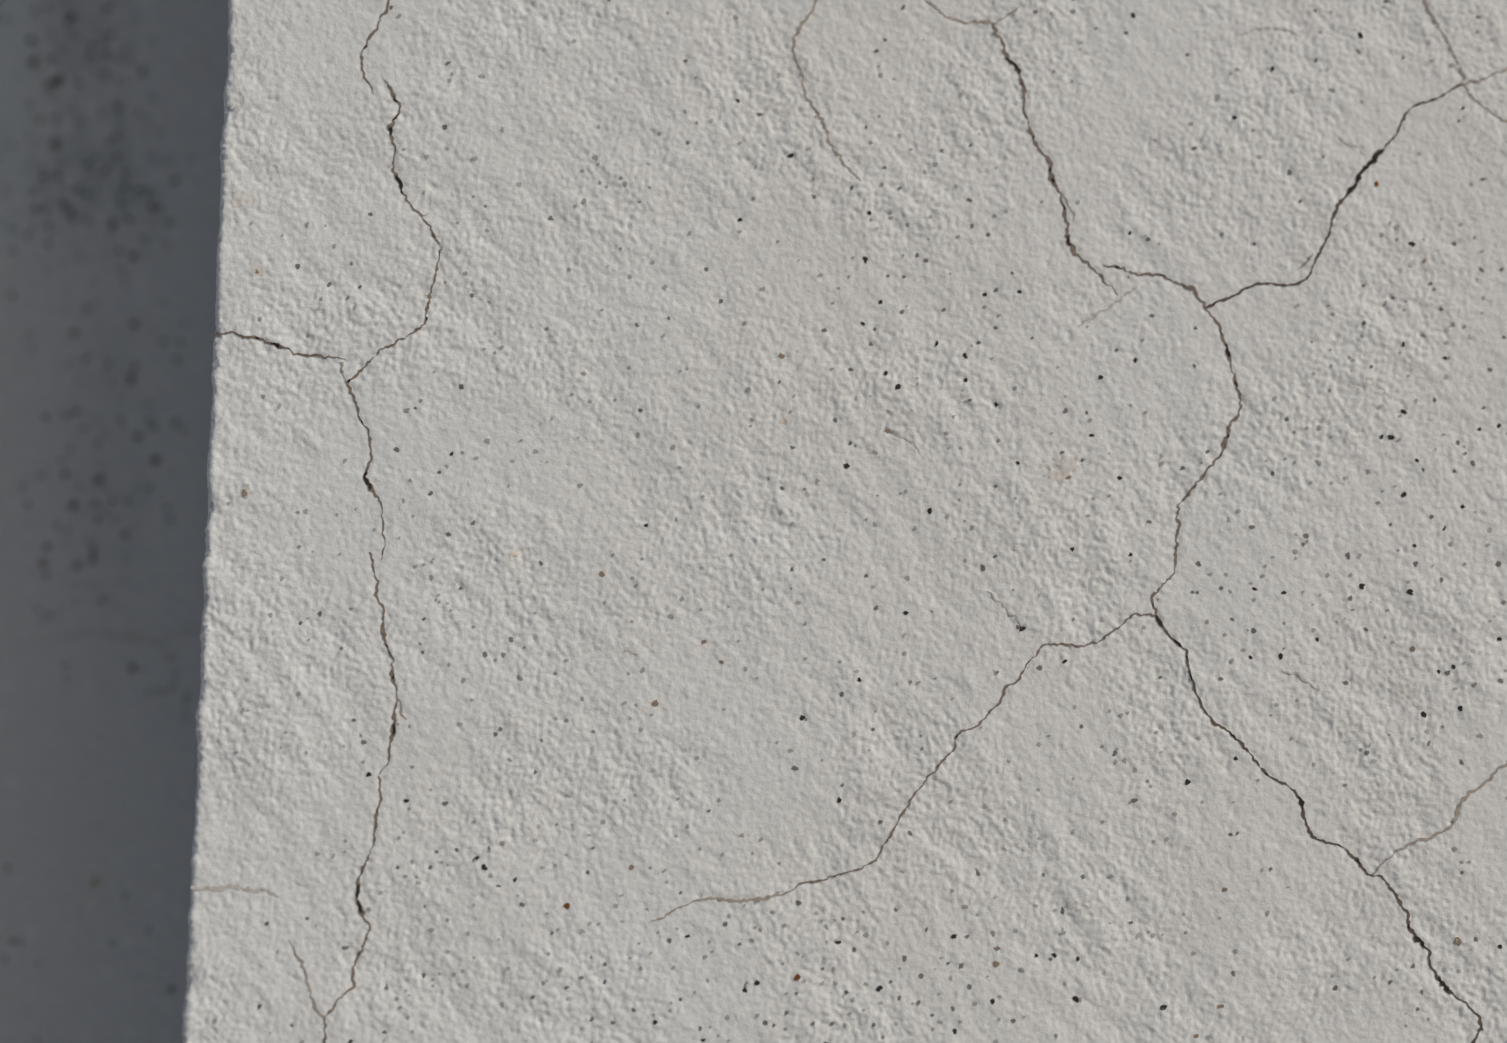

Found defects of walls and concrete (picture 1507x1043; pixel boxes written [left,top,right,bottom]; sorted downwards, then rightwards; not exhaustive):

water stain [0,0,235,1043]
crack [191,883,278,897]
crack [214,0,442,1043]
crack [649,0,1507,1043]